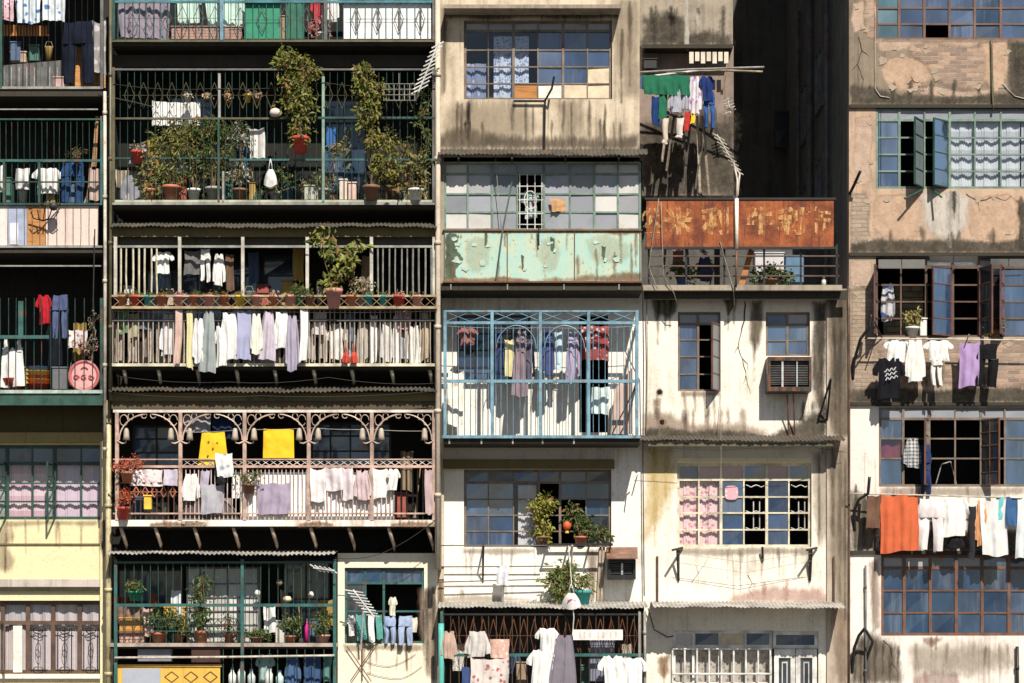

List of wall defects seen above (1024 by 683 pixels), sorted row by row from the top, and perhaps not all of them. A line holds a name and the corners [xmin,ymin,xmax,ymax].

damp [620,1,730,72]
flaking render [851,0,1011,97]
damp [441,101,637,149]
peeling [444,233,490,279]
peeling [542,237,557,269]
peeling [590,236,627,262]
crack [736,301,749,387]
damp [645,300,1024,524]